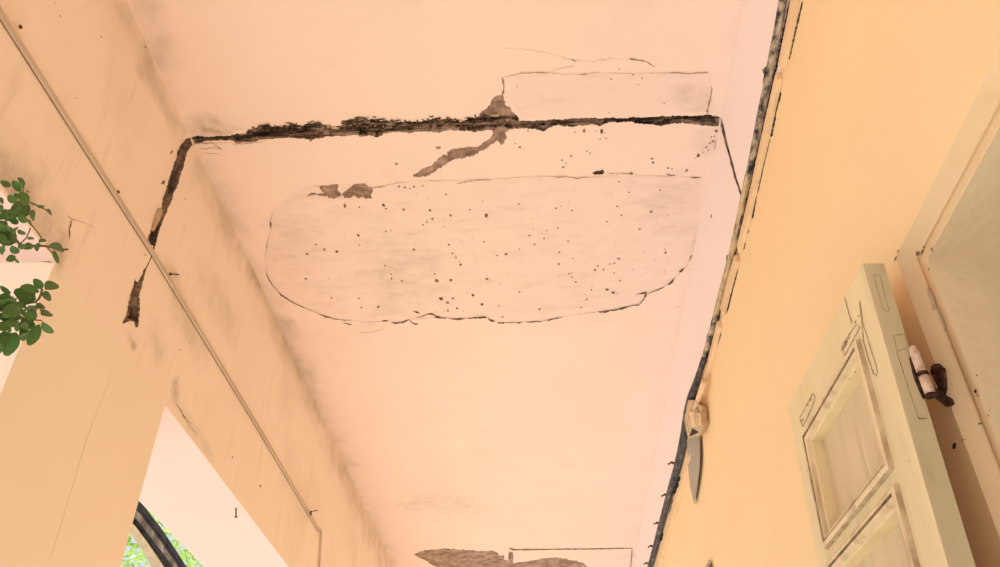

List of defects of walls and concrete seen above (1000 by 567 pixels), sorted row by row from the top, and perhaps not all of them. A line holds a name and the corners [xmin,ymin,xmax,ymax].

flaking render [302,183,373,208]
crack [123,47,741,333]
flaking render [398,91,521,194]
flaking render [414,548,587,567]